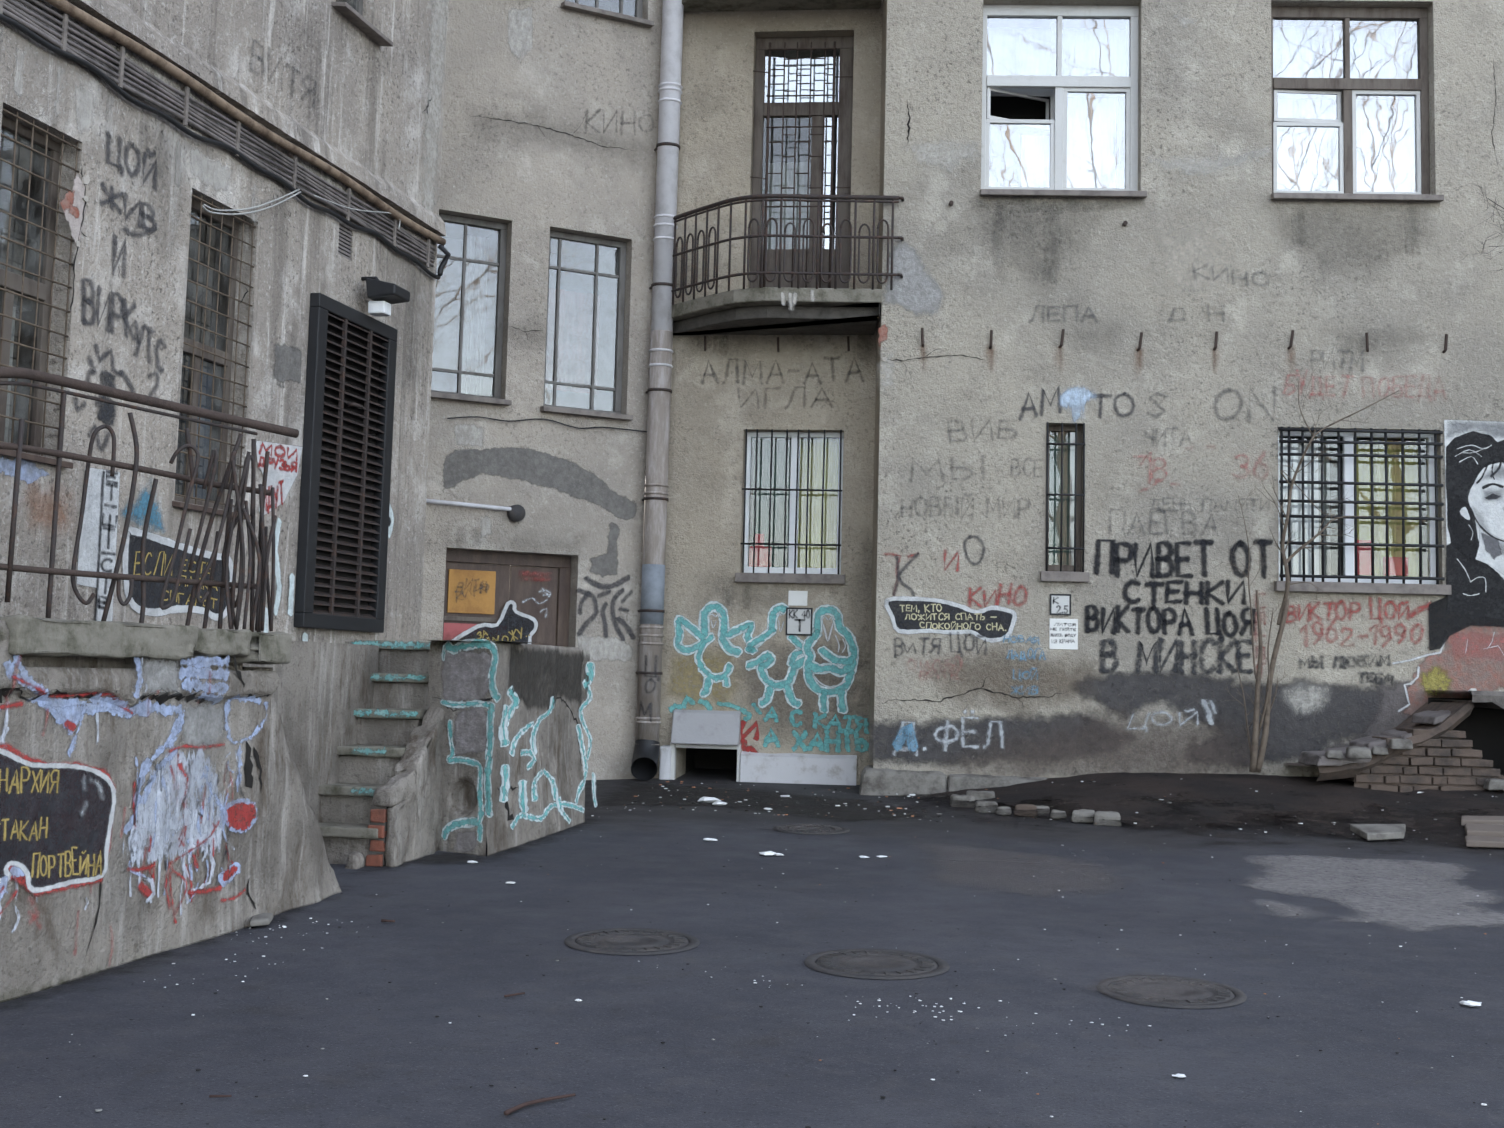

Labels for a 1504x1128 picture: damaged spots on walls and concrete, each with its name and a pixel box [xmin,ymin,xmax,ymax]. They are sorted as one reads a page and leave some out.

spalling [0,688,14,703]
crack [885,677,1067,707]